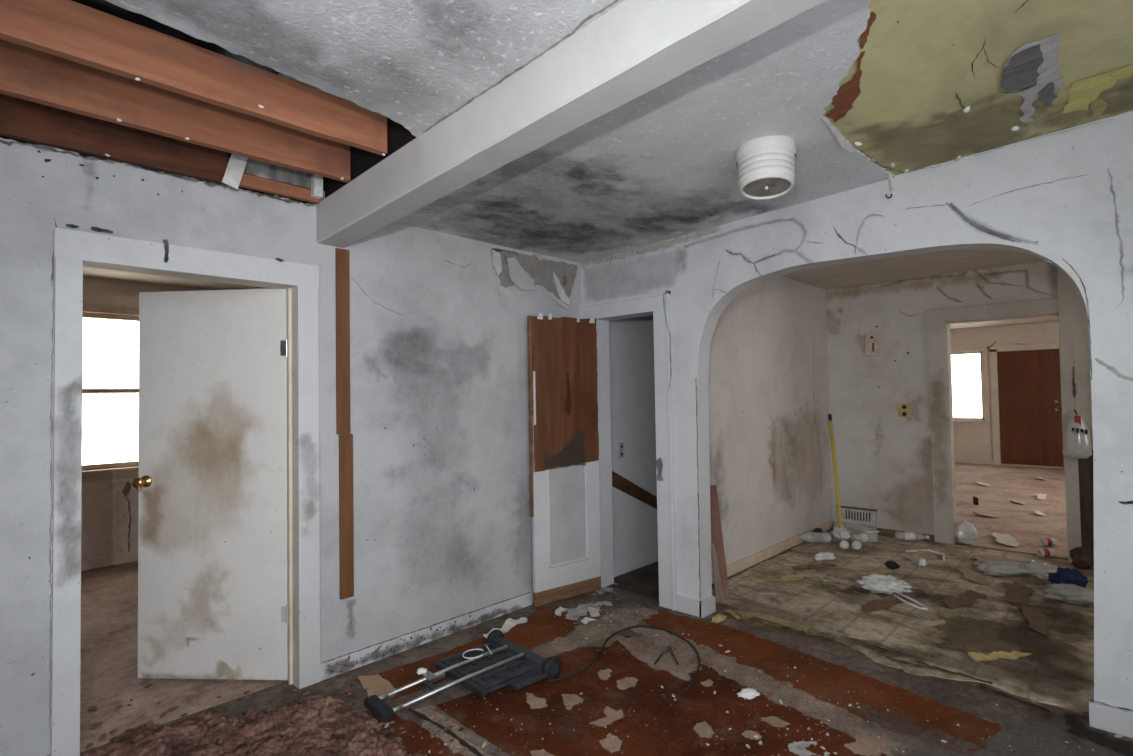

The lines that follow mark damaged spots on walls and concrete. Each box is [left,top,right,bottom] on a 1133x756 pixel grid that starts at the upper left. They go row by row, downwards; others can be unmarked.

flaking render [1001,34,1133,123]
damp [480,201,714,267]
crack [922,203,1021,243]
peeling [491,248,595,323]
crack [1062,258,1133,381]